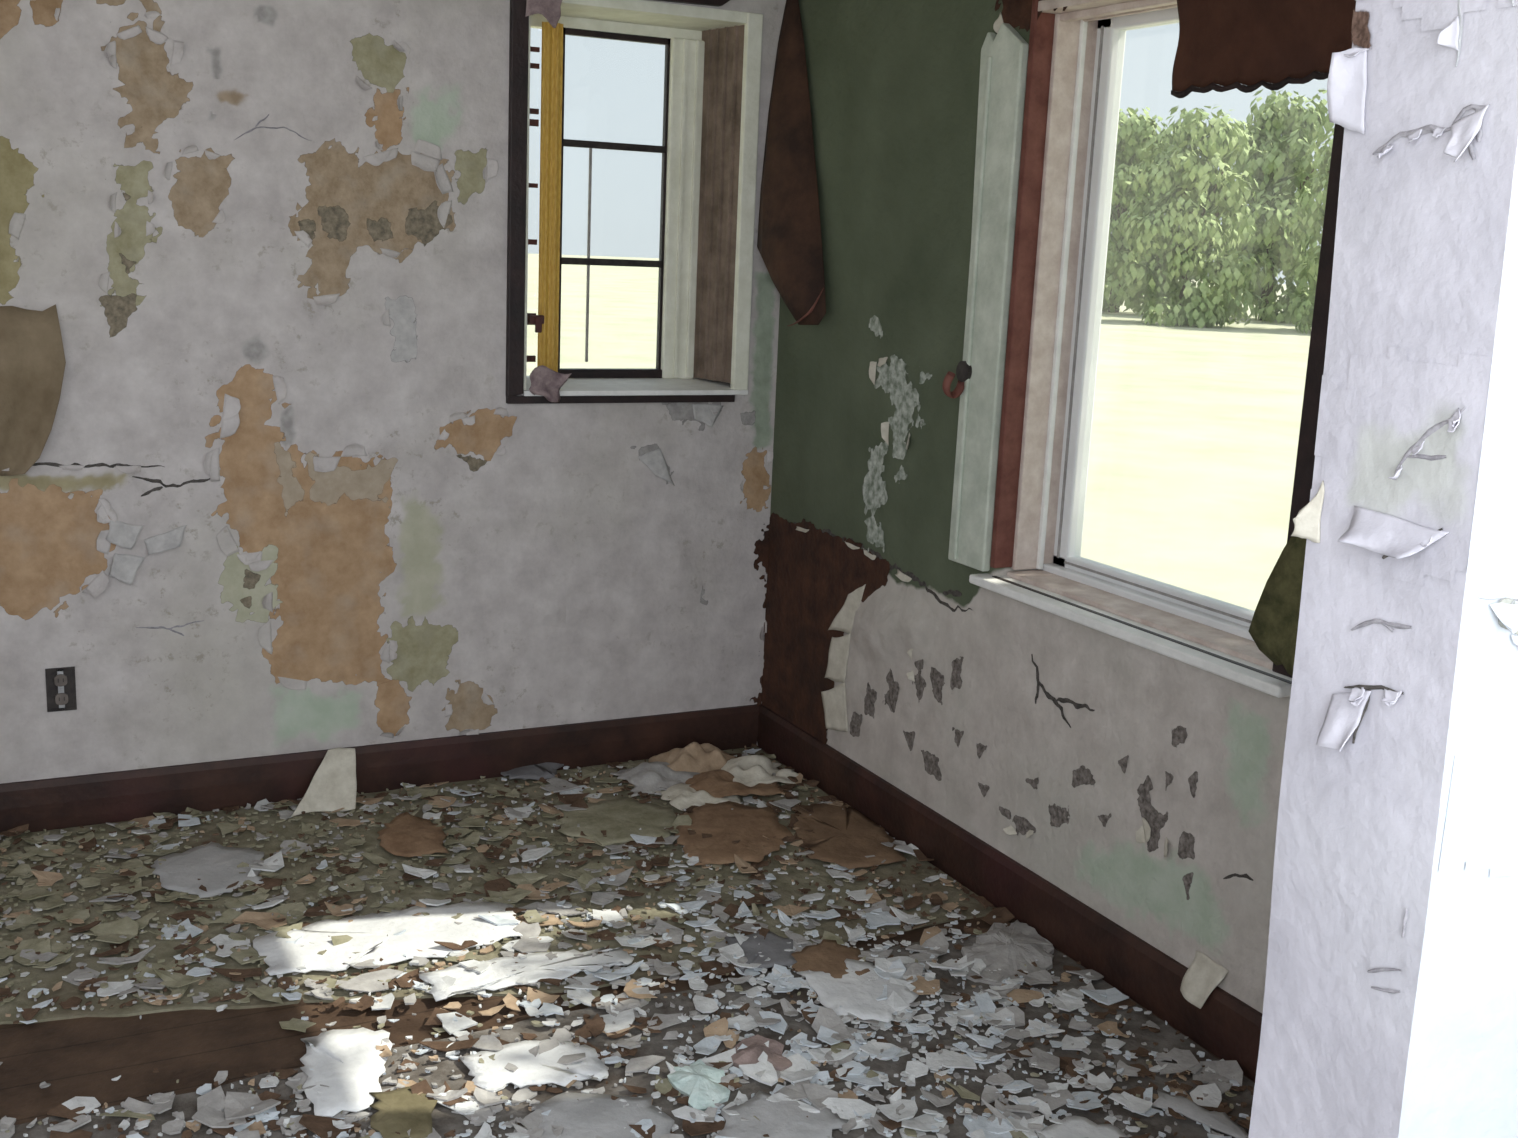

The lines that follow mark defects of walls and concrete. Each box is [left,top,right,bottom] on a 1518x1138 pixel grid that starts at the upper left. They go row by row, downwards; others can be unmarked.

peeling [0,136,44,305]
peeling [96,0,235,337]
peeling [288,33,498,306]
peeling [434,407,517,472]
peeling [0,478,118,620]
peeling [203,364,498,738]
peeling [740,354,932,744]
spalling [850,649,964,737]
spalling [903,731,942,781]
spalling [978,782,1070,838]
crack [1031,654,1094,728]
spalling [1135,771,1198,900]